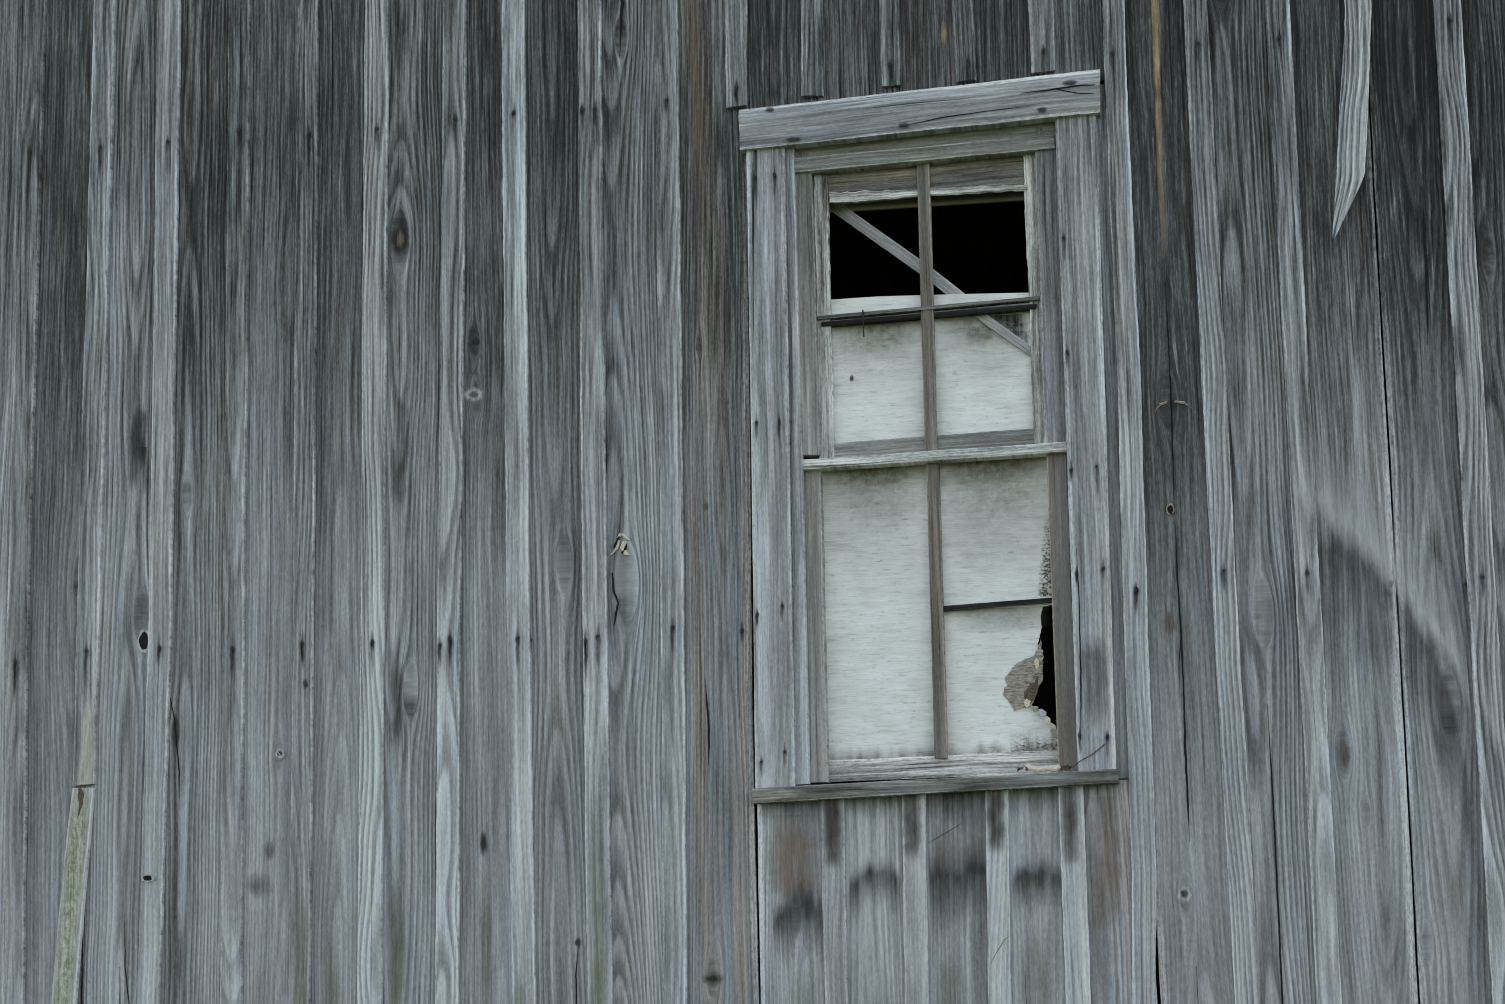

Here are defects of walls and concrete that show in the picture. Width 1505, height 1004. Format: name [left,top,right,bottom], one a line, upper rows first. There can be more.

damp [825,799,839,861]
damp [906,794,918,851]
damp [943,790,1003,847]
damp [1051,787,1077,854]
damp [850,865,900,897]
damp [929,855,986,904]
damp [1016,866,1062,892]
damp [773,894,820,931]